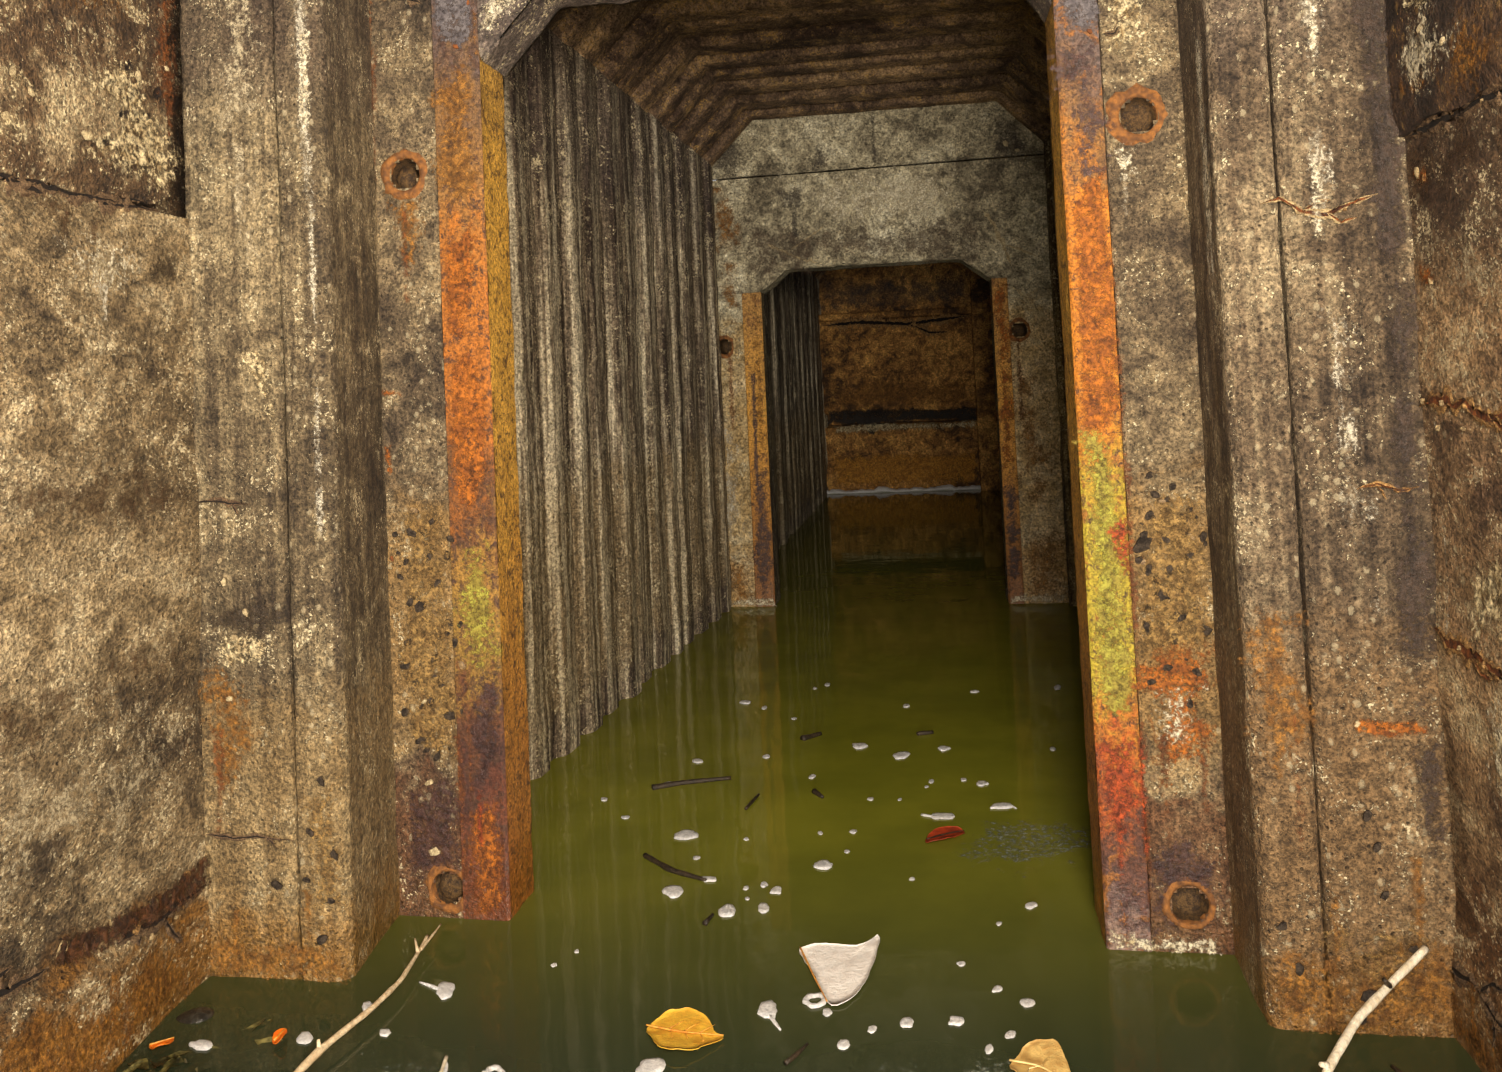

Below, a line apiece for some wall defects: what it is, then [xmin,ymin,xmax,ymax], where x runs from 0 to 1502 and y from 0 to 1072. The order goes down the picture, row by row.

rust [428,51,478,208]
crack [1405,83,1502,139]
crack [0,172,159,217]
rust [387,198,425,273]
rust [444,227,488,508]
crack [1419,384,1502,433]
rust [1047,44,1224,936]
crack [1433,627,1502,684]
rust [198,666,263,832]
rust [402,540,505,915]
crack [116,884,207,946]
crack [0,965,49,1005]